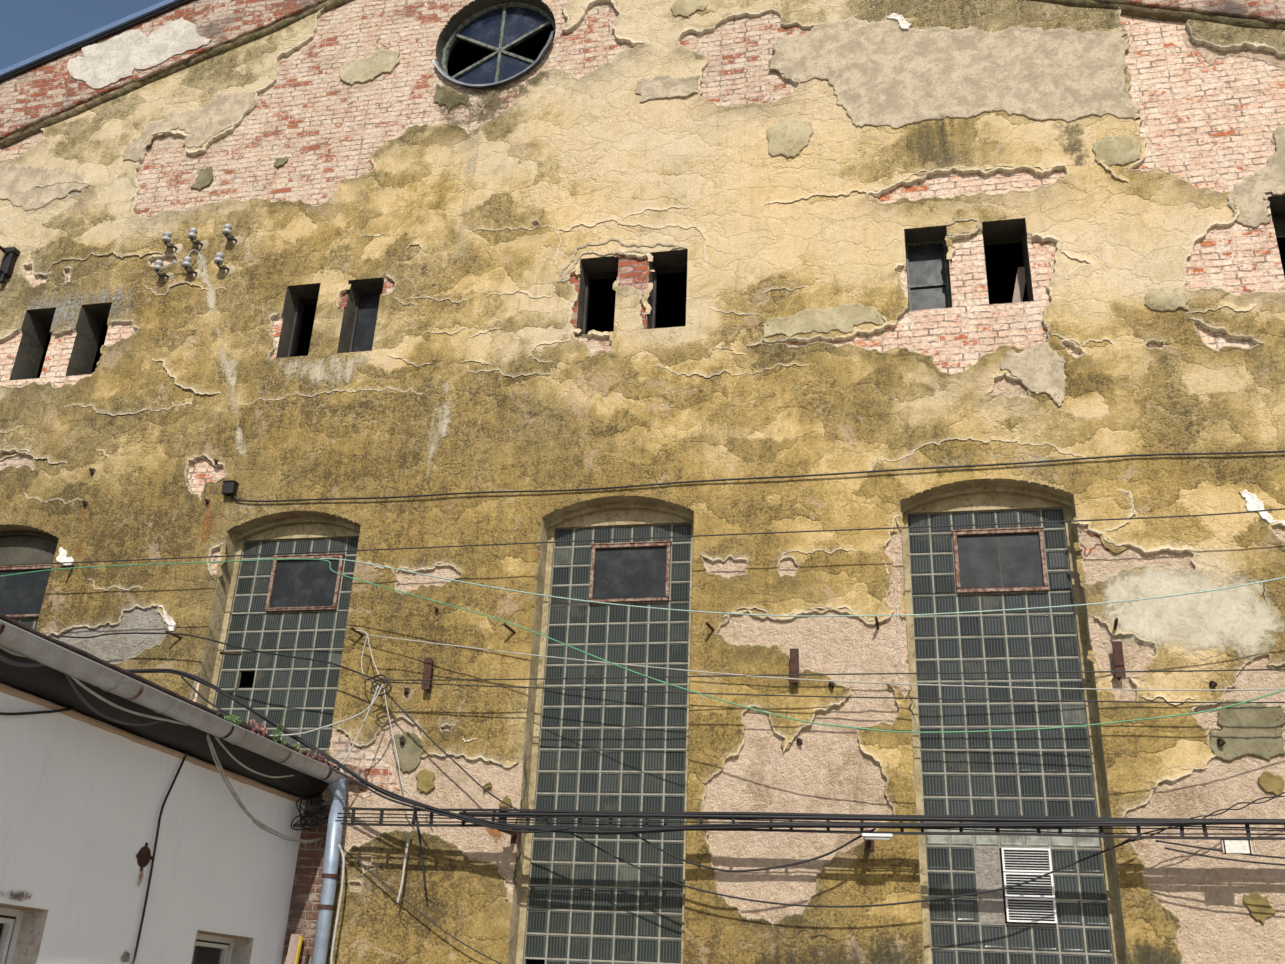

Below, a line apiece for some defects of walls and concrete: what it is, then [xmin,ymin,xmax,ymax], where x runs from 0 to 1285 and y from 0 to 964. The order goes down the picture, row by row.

peeling [887,13,912,30]
spalling [130,0,646,221]
spalling [1097,9,1285,353]
spalling [652,228,1114,378]
spalling [984,370,1033,400]
spalling [0,424,68,473]
flaking render [23,491,83,504]
peeling [56,547,74,565]
spalling [45,577,176,666]
spalling [698,513,912,929]
spalling [1087,613,1285,964]
leakage [756,939,916,964]